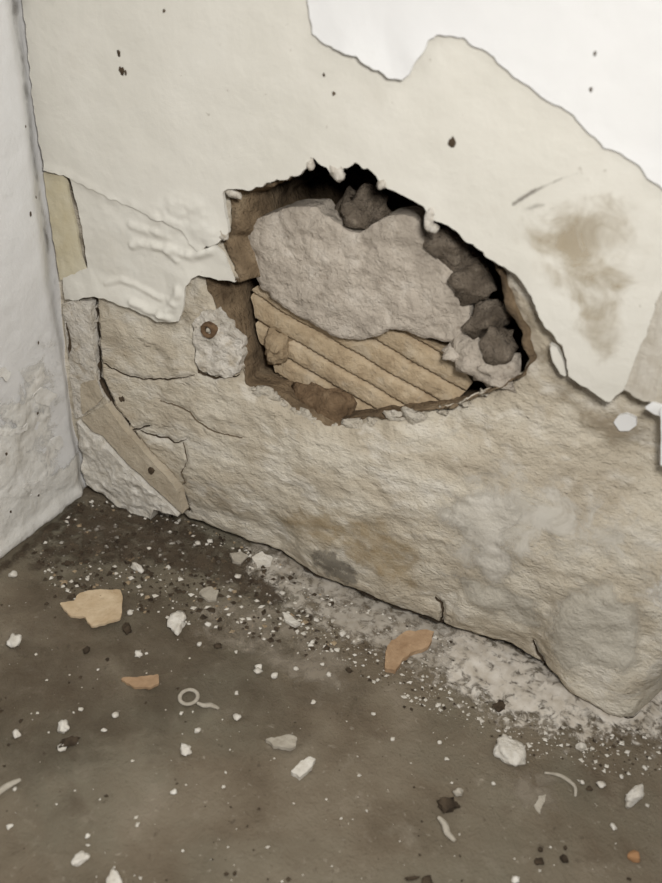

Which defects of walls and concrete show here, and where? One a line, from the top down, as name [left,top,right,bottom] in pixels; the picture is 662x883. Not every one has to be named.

peeling [22,0,662,466]
leakage [555,220,589,267]
crack [63,298,243,485]
peeling [0,362,84,558]
leakage [475,489,582,557]
leakage [311,551,356,585]
flaking render [6,633,22,649]